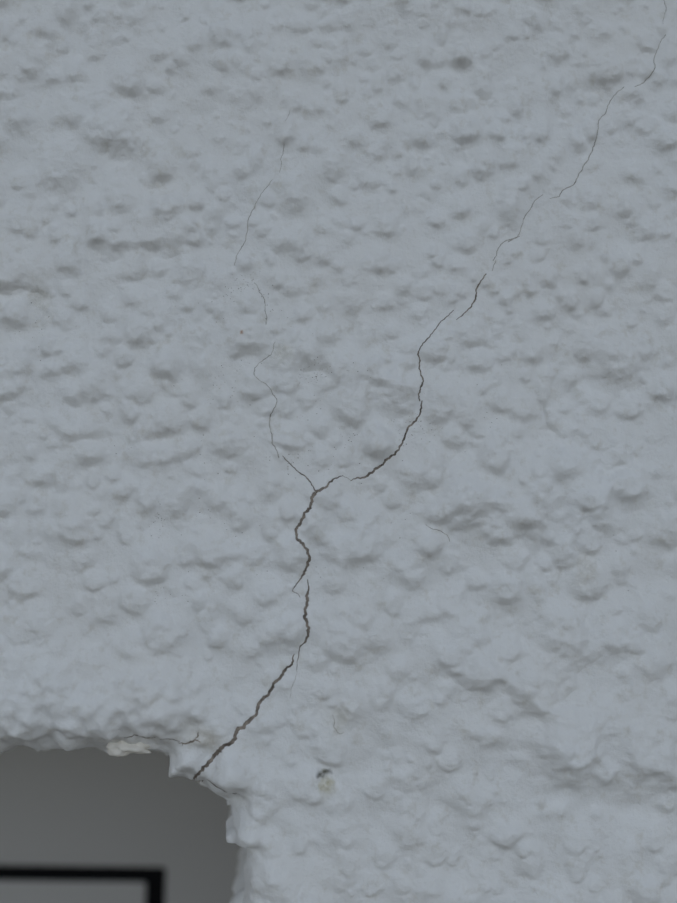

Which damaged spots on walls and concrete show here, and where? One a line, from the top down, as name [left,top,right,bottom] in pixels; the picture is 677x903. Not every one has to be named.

crack [127,1,667,795]